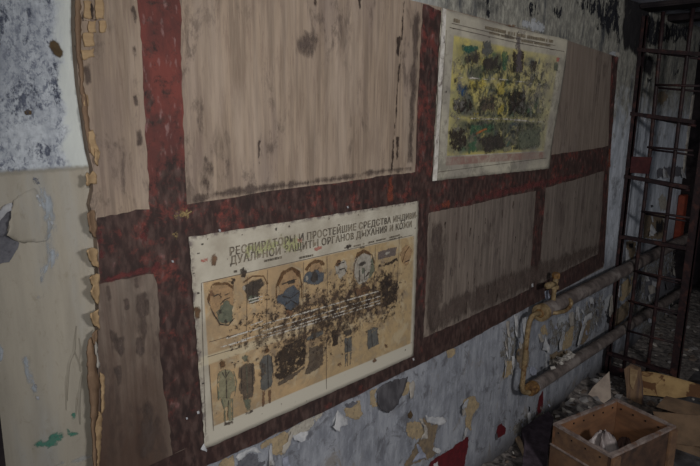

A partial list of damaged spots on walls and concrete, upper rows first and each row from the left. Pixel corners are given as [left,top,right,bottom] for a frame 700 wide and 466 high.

leakage [581,0,620,44]
leakage [6,79,41,115]
leakage [47,40,63,104]
peeling [0,188,52,264]
peeling [499,251,676,382]
peeling [219,412,323,466]
peeling [332,400,363,432]
peeling [370,377,415,413]
peeling [404,396,479,466]
flaking render [588,347,611,403]